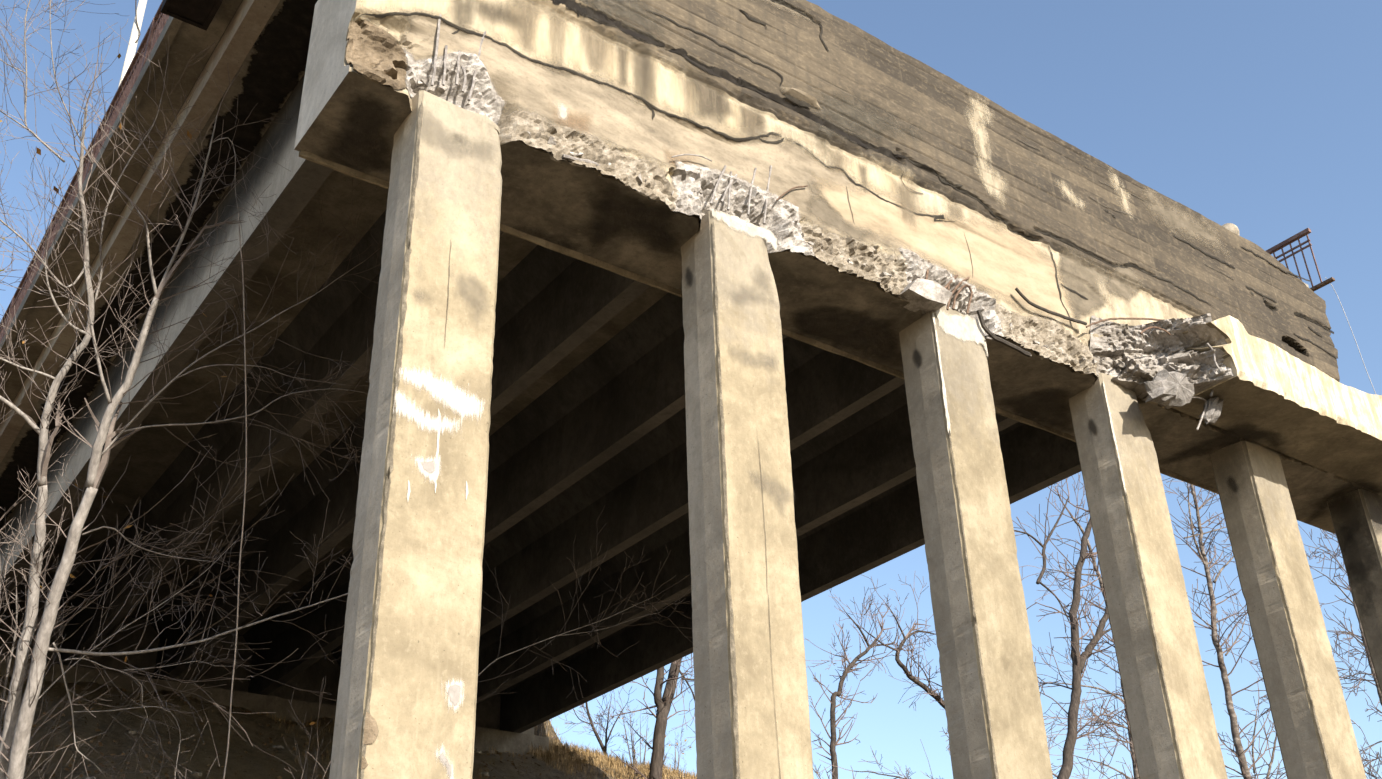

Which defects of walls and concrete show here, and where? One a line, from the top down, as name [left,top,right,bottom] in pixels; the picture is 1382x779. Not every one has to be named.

leakage [457,0,536,46]
leakage [583,0,662,97]
leakage [766,0,812,22]
leakage [685,77,763,133]
leakage [809,183,868,239]
crack [354,0,1338,359]
leakage [781,93,918,168]
efflorescence [971,100,1004,198]
leakage [1112,177,1128,211]
leakage [1144,188,1221,248]
leakage [1059,247,1144,320]
peeling [346,11,1235,779]